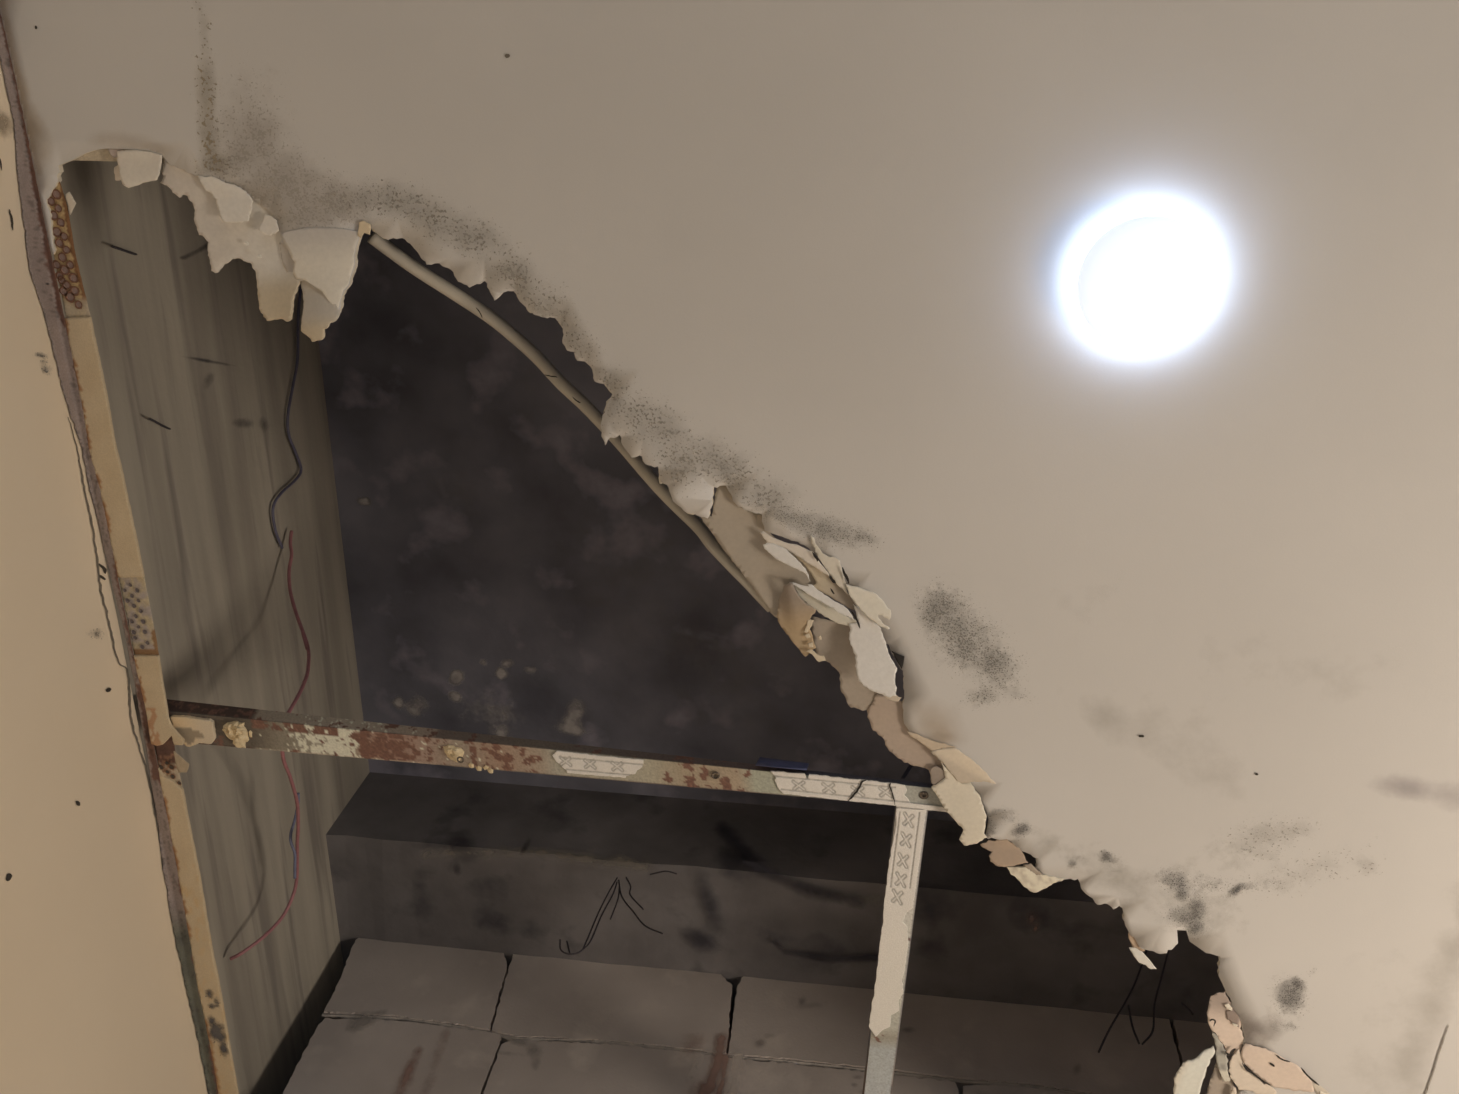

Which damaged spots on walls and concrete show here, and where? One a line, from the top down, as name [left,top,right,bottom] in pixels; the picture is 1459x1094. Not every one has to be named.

water stain [195,8,228,173]
water stain [360,180,884,548]
water stain [917,580,1028,704]
water stain [561,705,583,735]
water stain [1162,871,1289,939]
peeling [1128,932,1156,969]
water stain [1275,969,1317,1029]